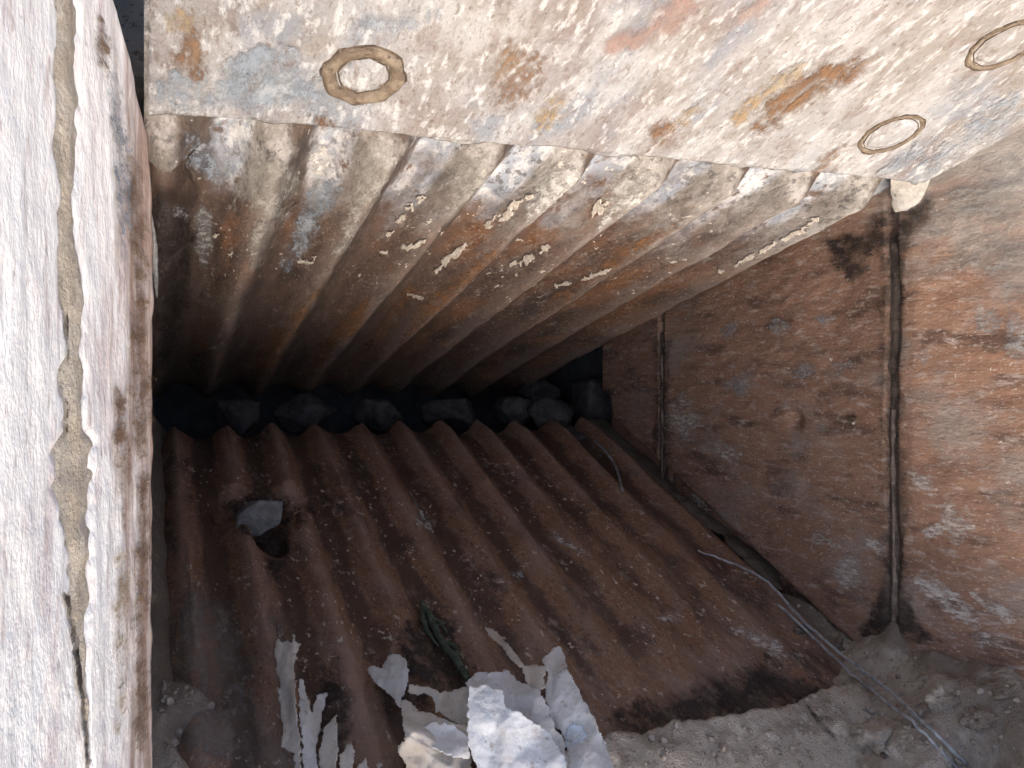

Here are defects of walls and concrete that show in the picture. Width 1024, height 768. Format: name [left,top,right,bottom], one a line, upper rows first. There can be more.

corrosion [165,9,207,84]
corrosion [732,59,866,135]
corrosion [646,107,698,152]
peeling [379,195,427,254]
peeling [483,194,534,229]
peeling [591,199,609,218]
peeling [434,242,468,274]
peeling [509,244,551,268]
peeling [554,268,612,288]
damp [827,239,873,282]
crack [51,0,93,768]